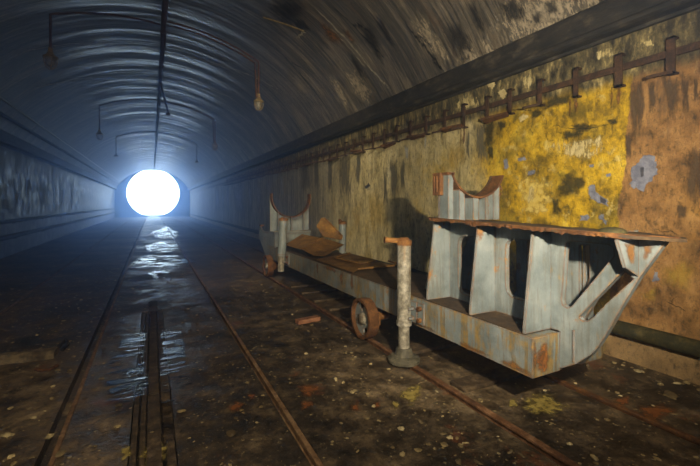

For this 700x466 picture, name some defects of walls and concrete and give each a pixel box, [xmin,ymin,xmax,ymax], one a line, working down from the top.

damp [413,17,494,64]
damp [532,95,574,118]
damp [466,122,505,159]
damp [563,124,592,139]
damp [328,152,360,198]
damp [383,148,408,202]
damp [552,174,585,214]
peeling [580,185,608,225]
peeling [629,155,658,192]